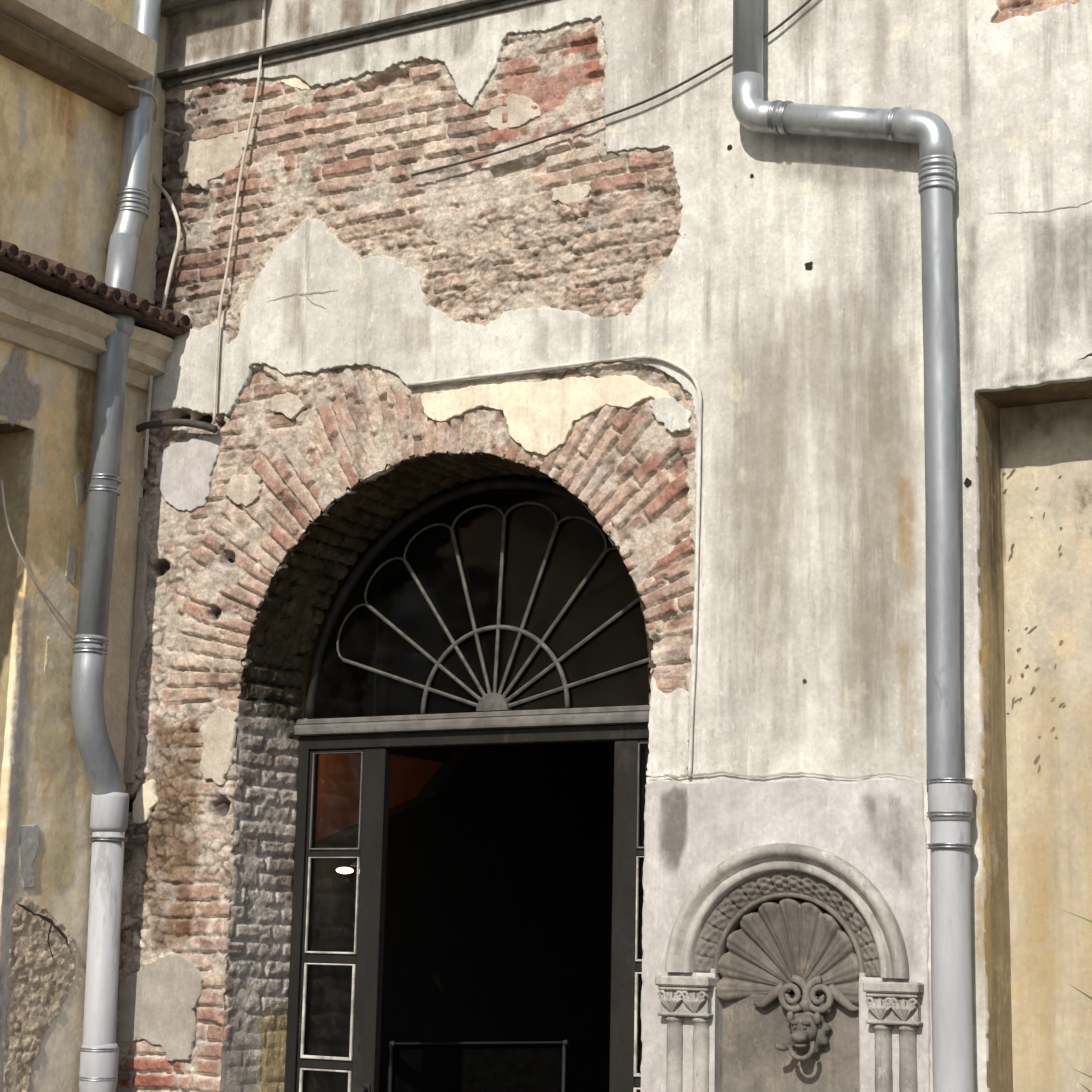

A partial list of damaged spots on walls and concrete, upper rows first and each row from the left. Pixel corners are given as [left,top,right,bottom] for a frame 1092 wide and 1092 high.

flaking render [154,17,686,344]
crack [997,200,1092,213]
damp [1041,225,1088,290]
crack [268,290,337,309]
peeling [1006,665,1040,714]
flaking render [116,361,698,1092]
flaking render [0,597,77,1092]